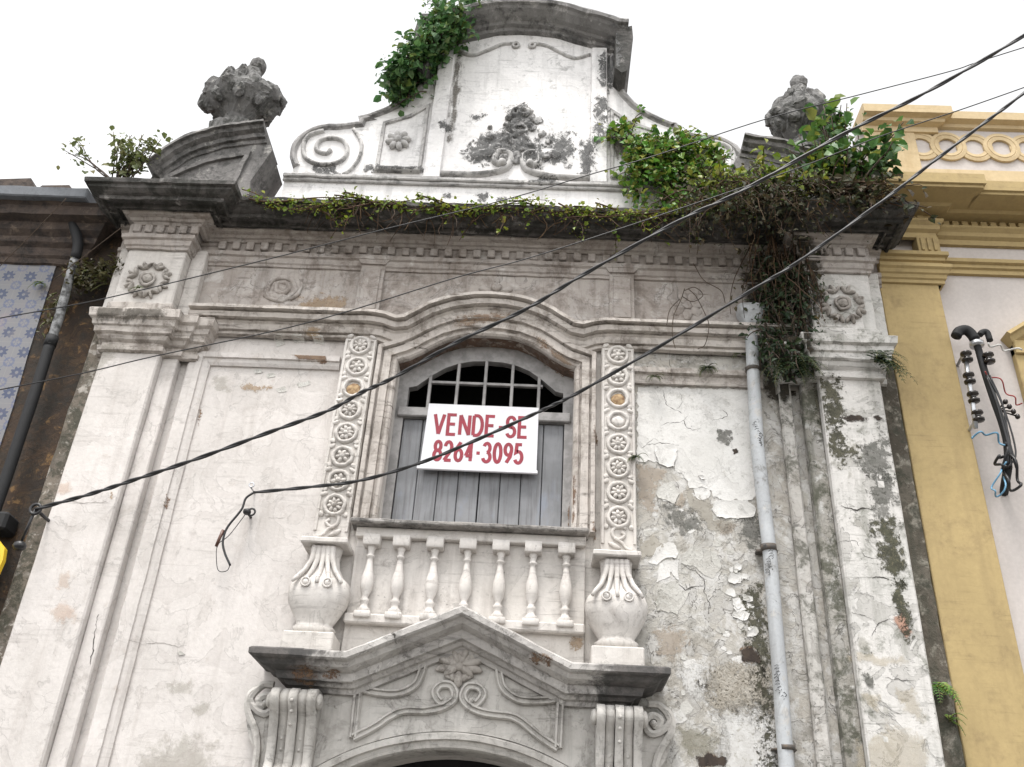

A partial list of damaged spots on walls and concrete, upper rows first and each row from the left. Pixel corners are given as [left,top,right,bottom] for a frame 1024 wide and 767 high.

crack [642,353,696,448]
water stain [853,426,899,519]
peeling [636,385,787,735]